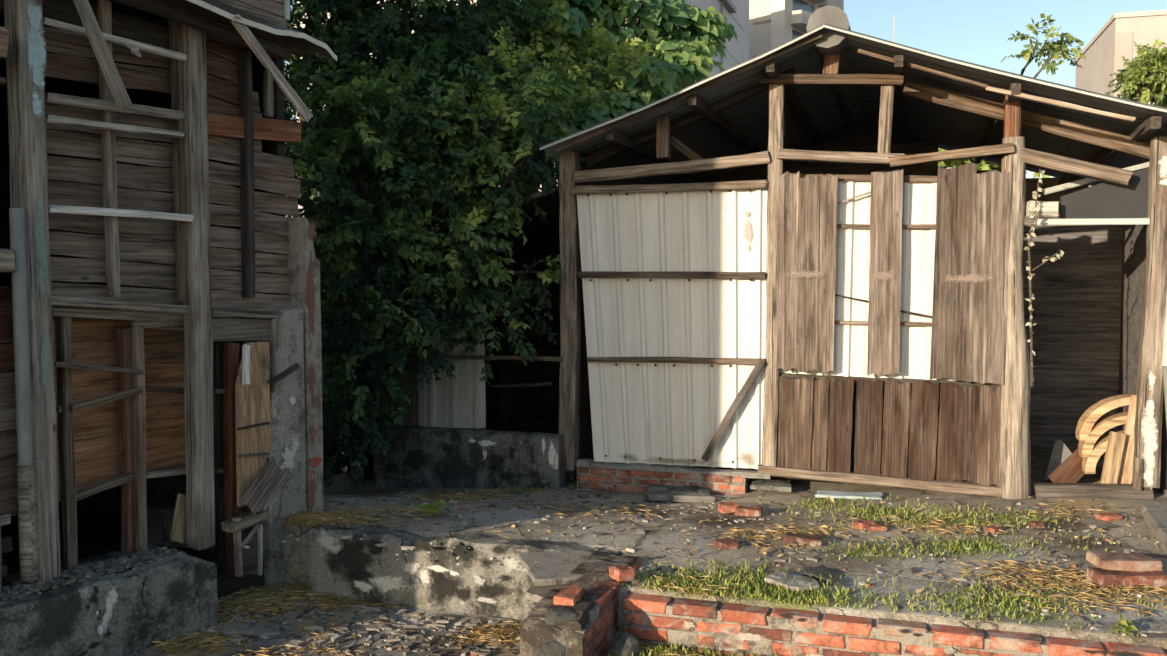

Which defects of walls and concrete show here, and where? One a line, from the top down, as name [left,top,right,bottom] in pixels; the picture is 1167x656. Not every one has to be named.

peeling [27,2,46,116]
flaking render [307,221,317,335]
flaking render [280,426,316,473]
damp [468,438,514,480]
damp [542,438,558,469]
peeling [1141,371,1158,486]
damp [327,539,383,581]
damp [410,539,504,567]
damp [431,571,510,600]
damp [78,586,118,656]